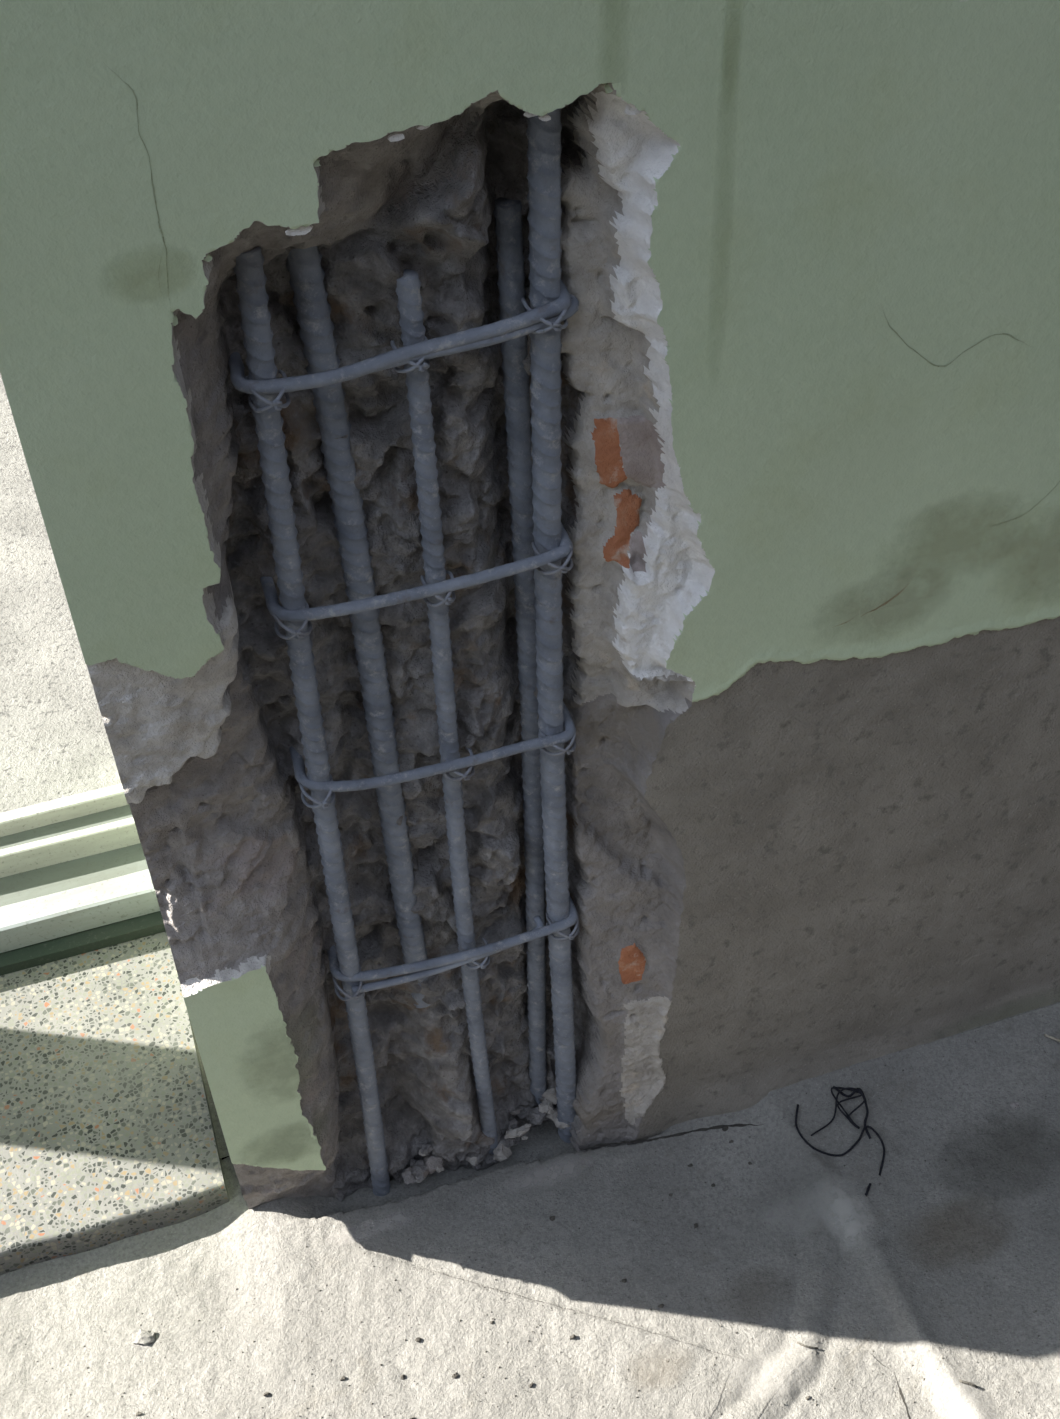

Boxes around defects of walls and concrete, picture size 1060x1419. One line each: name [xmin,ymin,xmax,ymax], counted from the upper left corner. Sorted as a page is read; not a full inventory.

crack [102,61,171,307]
crack [883,310,1031,367]
spalling [86,83,715,1209]